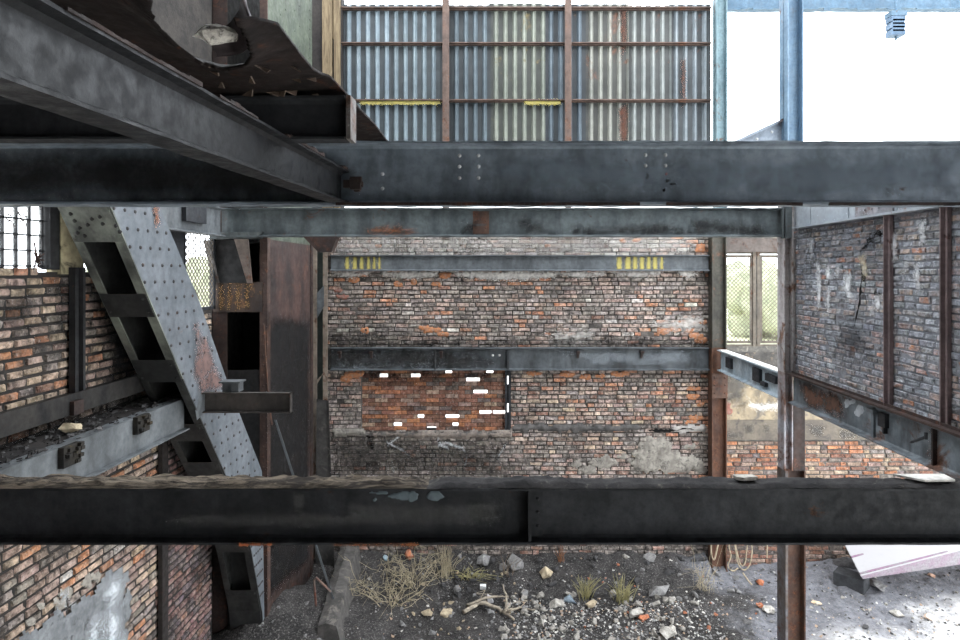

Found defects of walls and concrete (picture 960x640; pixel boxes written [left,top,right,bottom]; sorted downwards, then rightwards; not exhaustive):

corrosion [619,106,628,141]
crack [854,230,883,326]
corrosion [195,328,222,392]
peeling [331,387,708,475]
corrosion [802,384,843,418]
peeling [19,566,132,640]